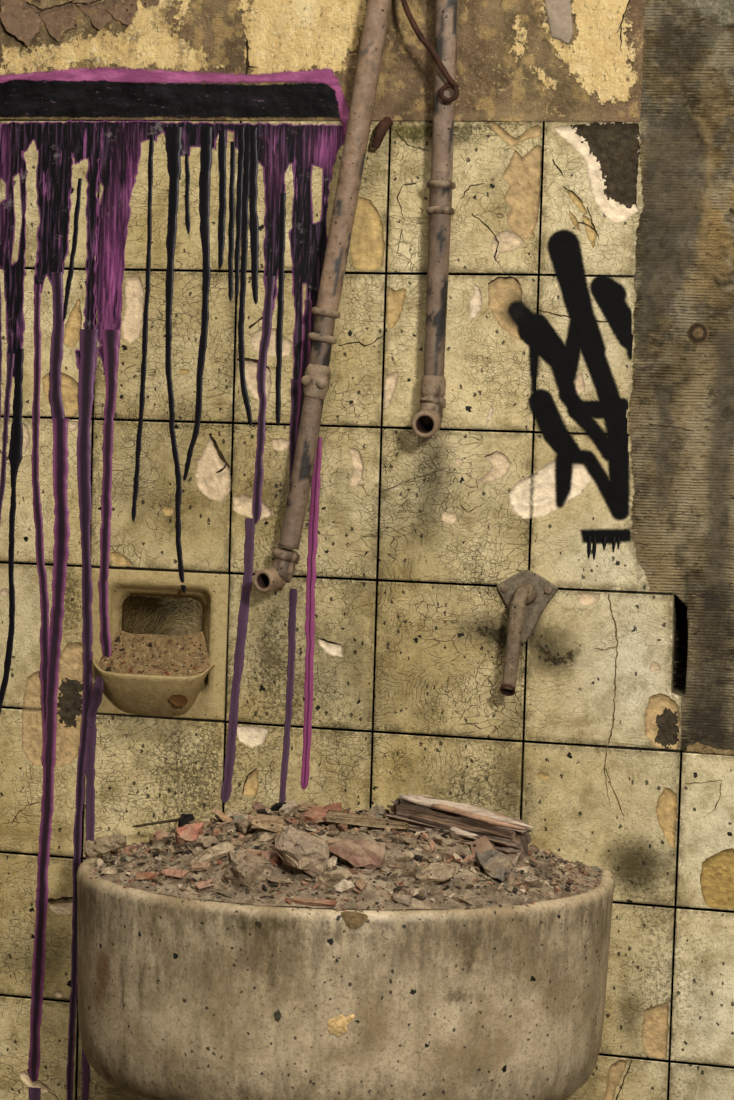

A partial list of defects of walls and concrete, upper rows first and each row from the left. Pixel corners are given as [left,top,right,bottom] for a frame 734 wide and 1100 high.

flaking render [0,0,226,76]
flaking render [235,0,367,85]
flaking render [509,0,641,107]
spalling [488,122,640,260]
crack [460,183,522,286]
spalling [195,436,275,520]
spalling [477,451,593,519]
spalling [22,642,84,767]
crack [595,594,623,814]
spalling [644,693,734,755]
crack [685,780,722,815]
spalling [700,848,734,910]